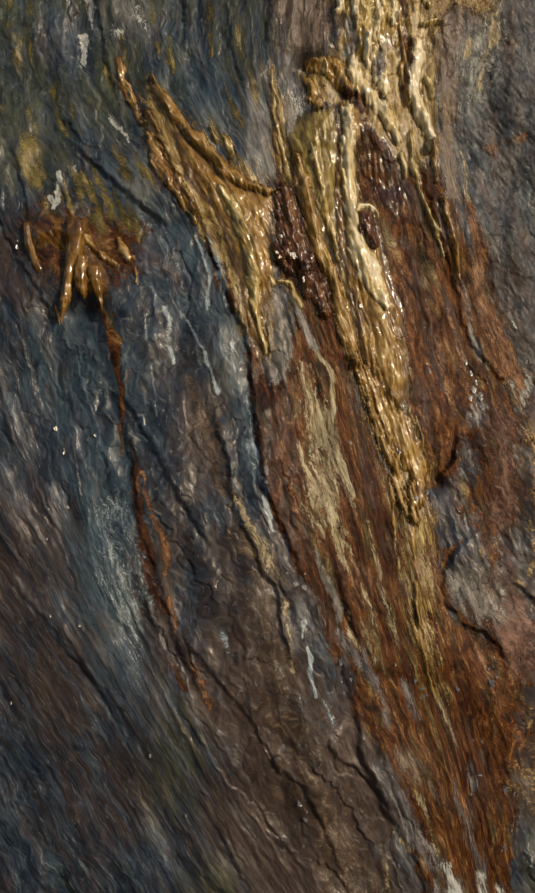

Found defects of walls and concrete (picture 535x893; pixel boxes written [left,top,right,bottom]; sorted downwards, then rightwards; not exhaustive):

damp [47,170,75,216]
damp [73,155,151,242]
damp [131,2,175,75]
damp [179,24,350,218]
damp [327,0,509,179]
damp [108,81,391,730]
corrosion [243,0,535,893]
damp [459,279,489,430]
damp [90,493,155,675]
corrosion [180,374,391,893]
damp [345,358,516,747]
damp [452,739,504,893]